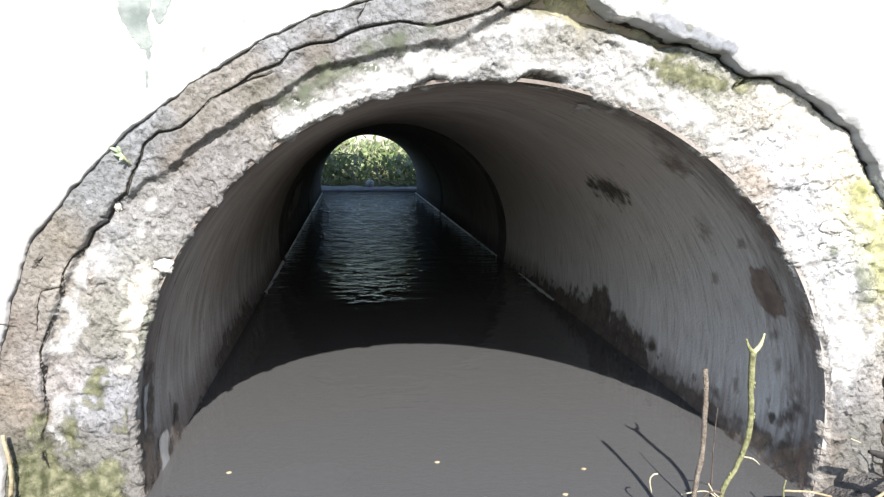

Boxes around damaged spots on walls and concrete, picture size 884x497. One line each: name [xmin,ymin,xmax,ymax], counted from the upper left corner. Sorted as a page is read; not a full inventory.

crack [593,10,884,203]
water stain [45,243,109,353]
crack [36,0,533,490]
rust [750,266,785,318]
water stain [52,396,79,413]